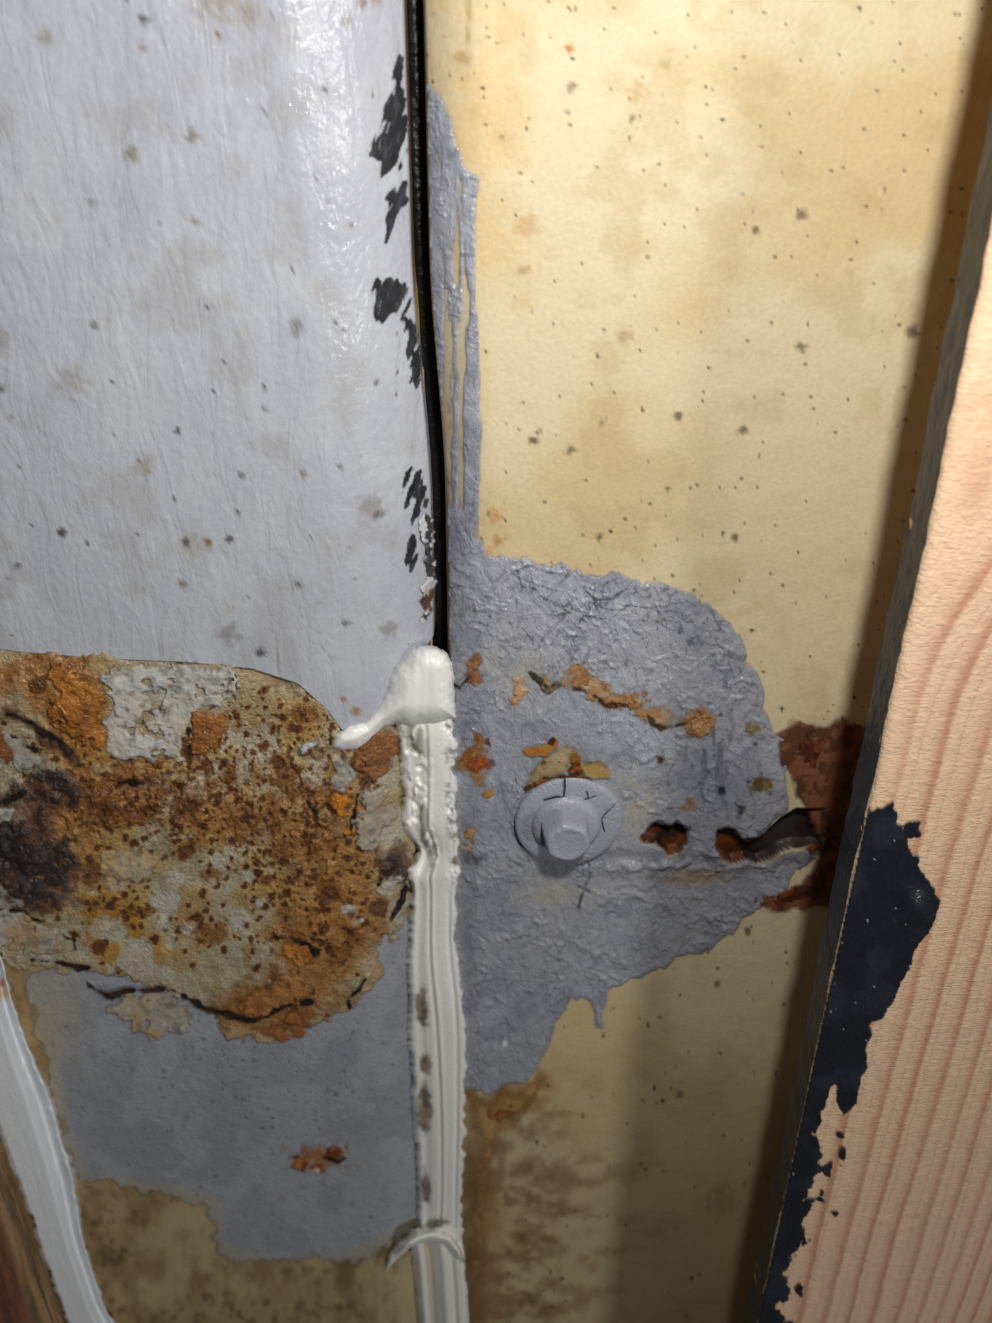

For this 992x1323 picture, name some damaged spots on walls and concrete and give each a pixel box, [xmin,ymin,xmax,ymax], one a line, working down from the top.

peeling [418,514,437,624]
corrosion [454,653,483,689]
corrosion [510,676,528,705]
peeling [529,664,716,738]
corrosion [457,734,495,798]
peeling [524,737,611,792]
corrosion [0,649,417,1044]
corrosion [457,827,476,853]
corrosion [756,717,865,912]
corrosion [292,1146,348,1173]